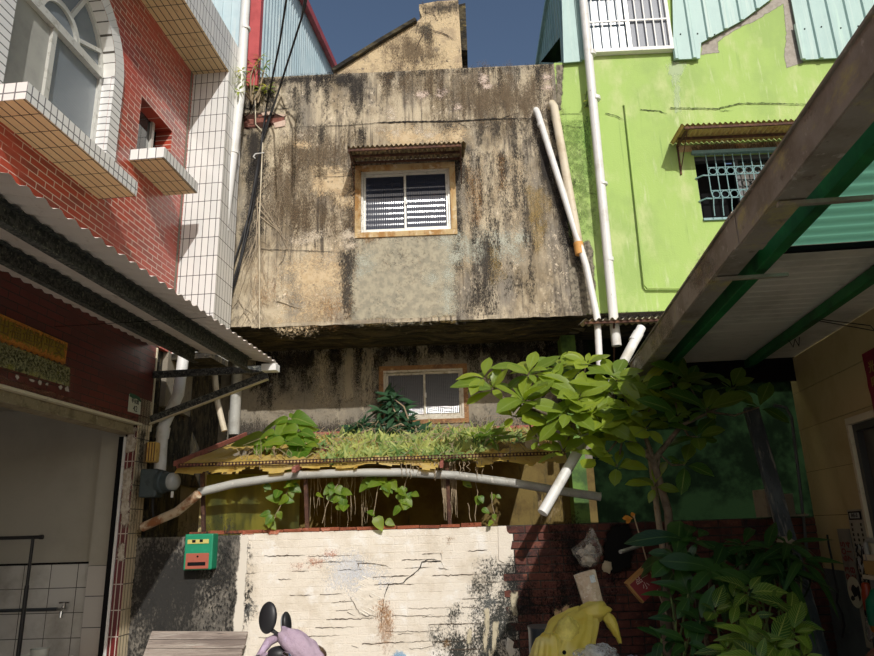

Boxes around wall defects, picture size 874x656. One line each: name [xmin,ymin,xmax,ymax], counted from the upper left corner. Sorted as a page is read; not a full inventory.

peeling [701,0,803,68]
leakage [239,71,368,325]
leakage [379,0,596,315]
leakage [233,341,559,437]
leakage [575,340,594,378]
mould [128,517,258,656]
crack [264,553,489,650]
leakage [429,511,624,656]